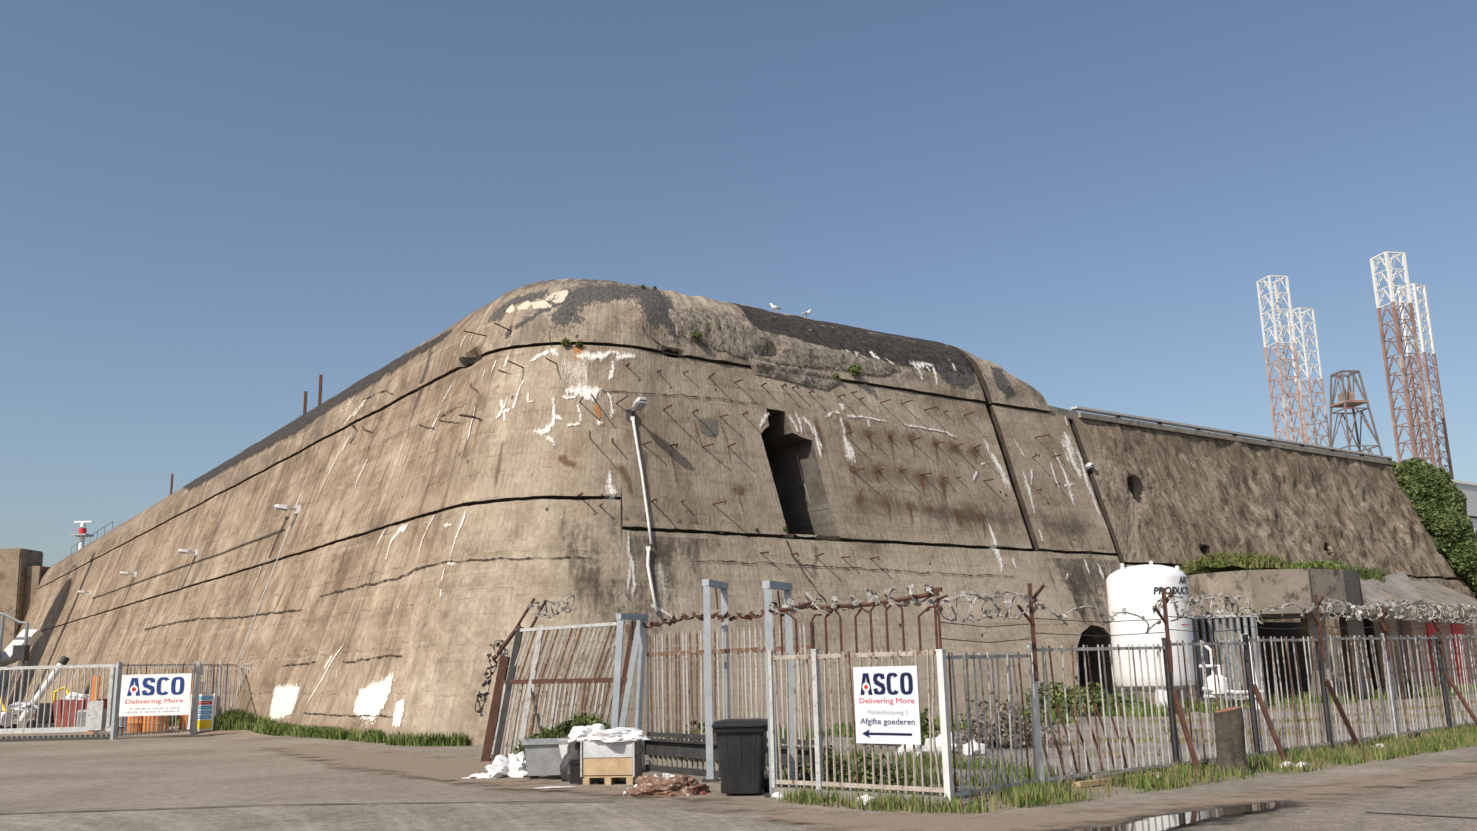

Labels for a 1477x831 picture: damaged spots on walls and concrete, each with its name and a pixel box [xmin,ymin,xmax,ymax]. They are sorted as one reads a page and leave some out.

water stain [531,349,636,445]
spalling [183,282,1016,491]
water stain [789,403,886,463]
water stain [847,350,956,385]
water stain [973,439,1035,513]
water stain [1050,416,1100,516]